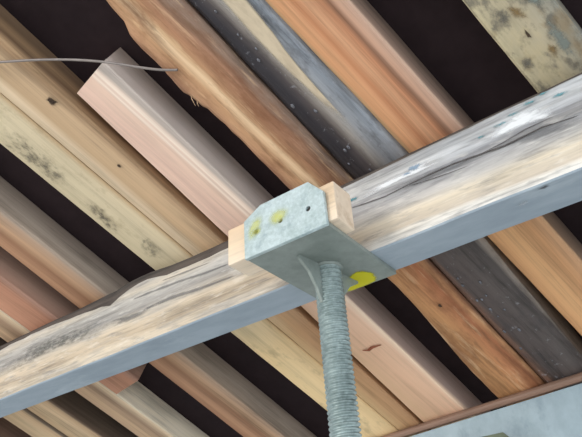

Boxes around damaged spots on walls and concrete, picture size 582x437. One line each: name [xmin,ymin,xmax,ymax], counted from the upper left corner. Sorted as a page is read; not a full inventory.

damp [497,8,524,22]
crack [352,116,576,208]